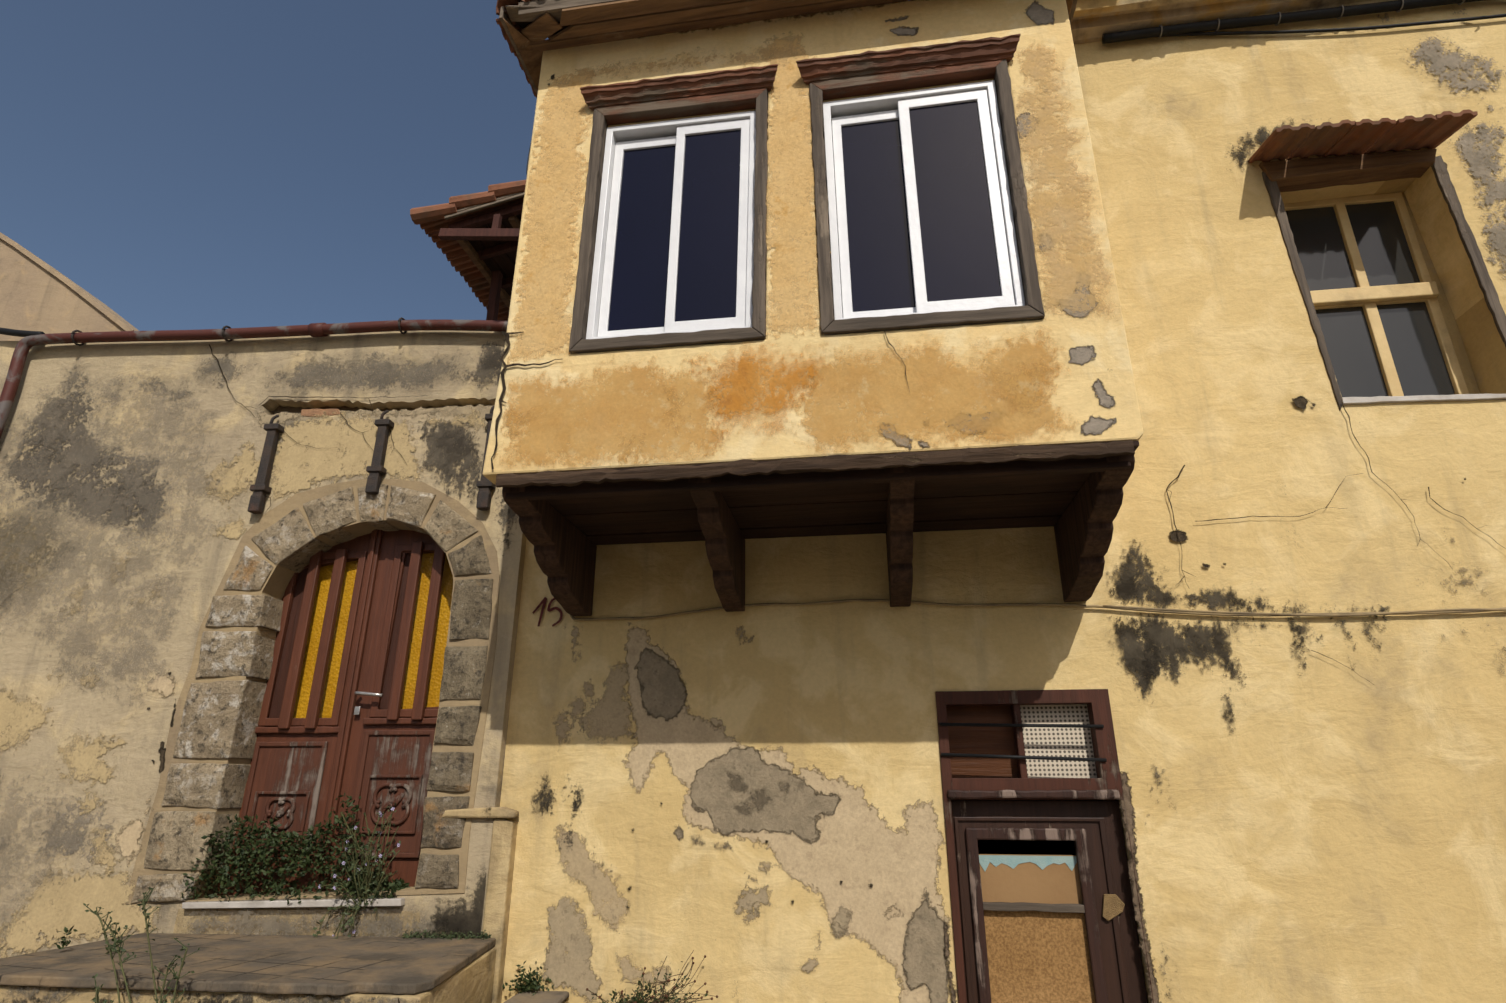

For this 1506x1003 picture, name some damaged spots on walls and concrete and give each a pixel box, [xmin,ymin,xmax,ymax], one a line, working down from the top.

peeling [1025,0,1054,25]
peeling [1011,43,1114,318]
damp [1227,119,1294,170]
damp [0,366,171,606]
crack [209,344,428,463]
damp [264,342,505,396]
damp [417,419,484,503]
peeling [1068,345,1097,365]
peeling [1081,378,1117,435]
crack [1166,402,1506,588]
mould [1107,539,1389,732]
peeling [542,622,958,1003]